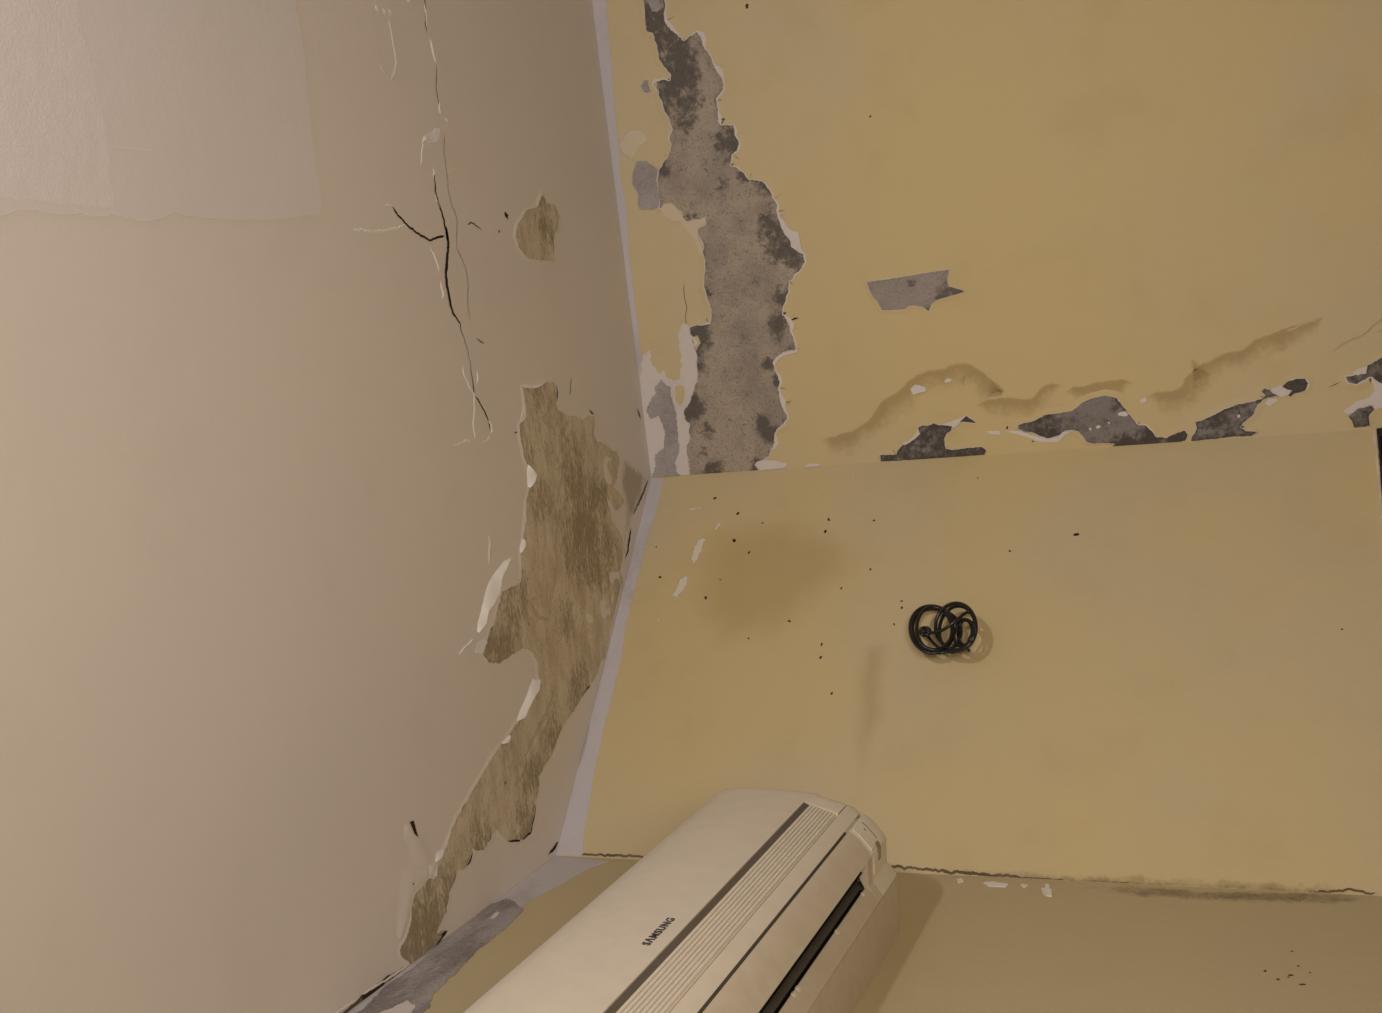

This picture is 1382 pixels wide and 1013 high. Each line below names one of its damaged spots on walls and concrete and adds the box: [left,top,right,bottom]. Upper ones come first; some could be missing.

peeling [0,0,322,222]
crack [352,0,493,446]
peeling [498,190,561,265]
spalling [632,0,811,477]
peeling [863,265,969,315]
spalling [876,372,1314,462]
spalling [1338,351,1382,428]
peeling [356,377,626,1013]
crack [891,865,1161,885]
crack [1314,887,1377,895]